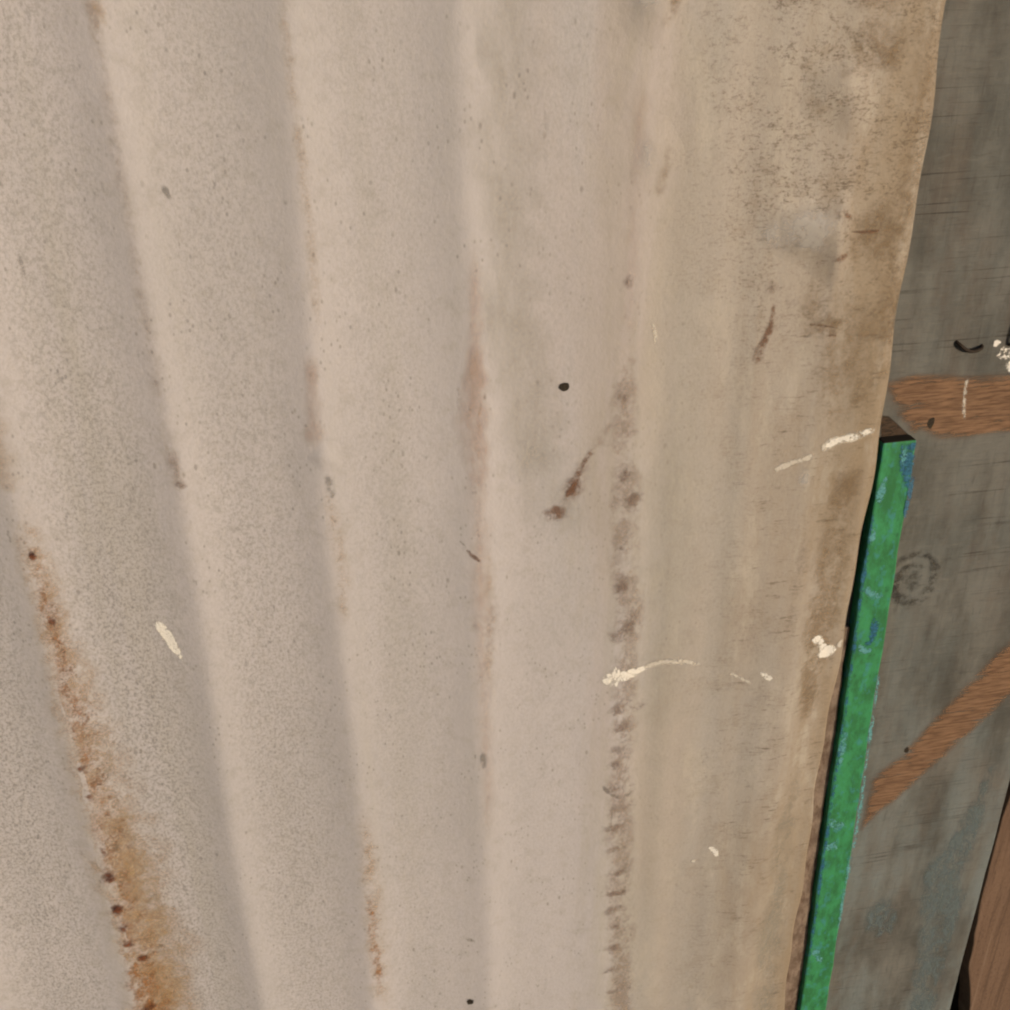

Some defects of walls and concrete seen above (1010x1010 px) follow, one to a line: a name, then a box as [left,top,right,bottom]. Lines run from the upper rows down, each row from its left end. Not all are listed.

corrosion [760,307,774,346]
corrosion [566,452,591,497]
corrosion [101,820,177,1010]